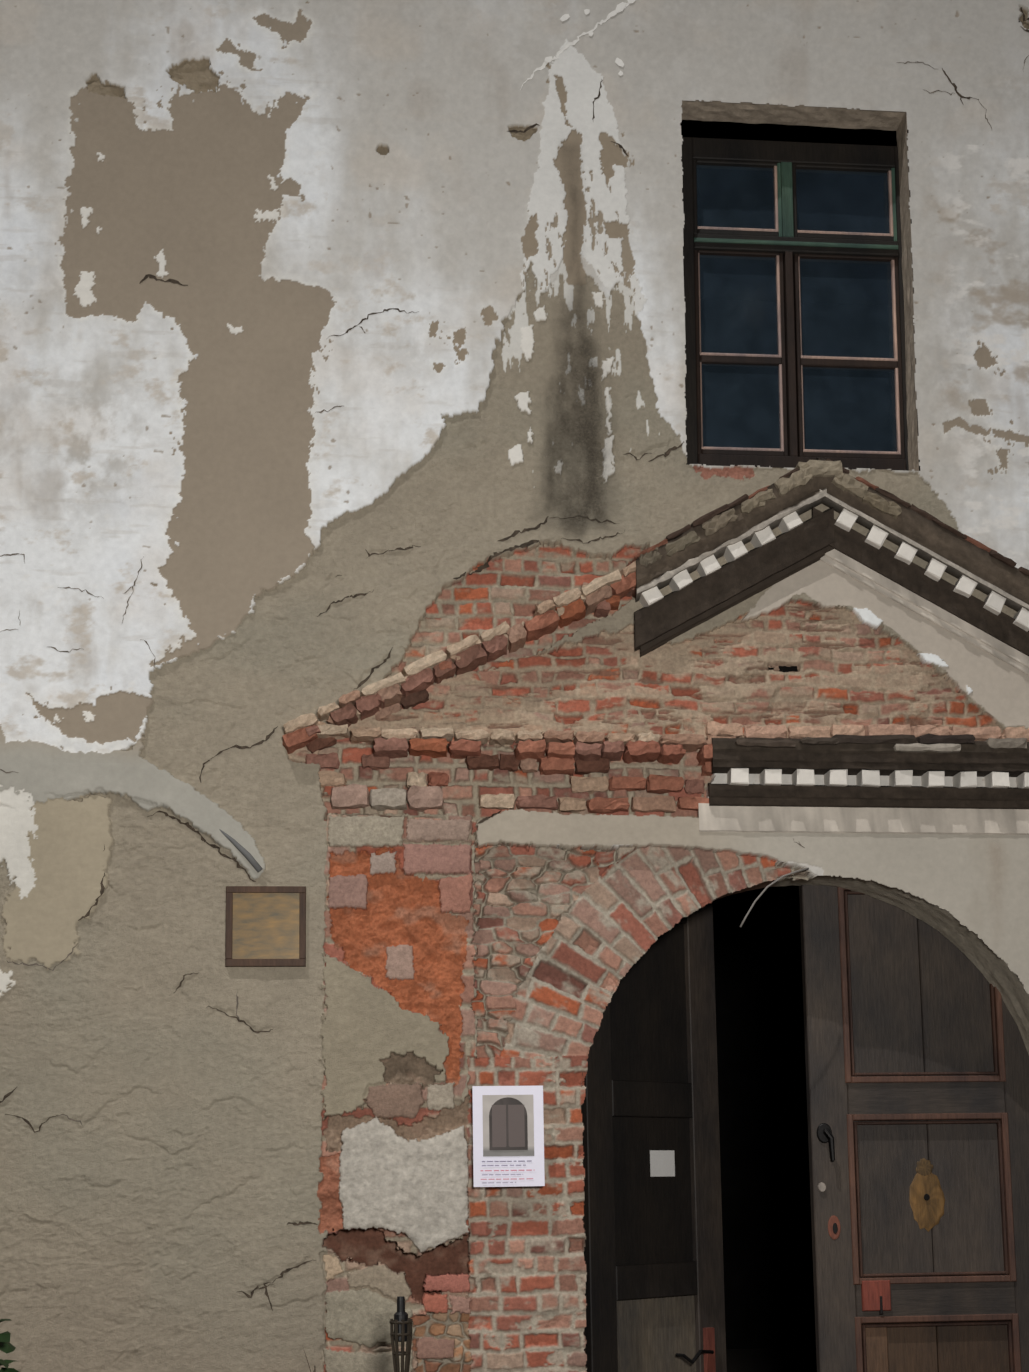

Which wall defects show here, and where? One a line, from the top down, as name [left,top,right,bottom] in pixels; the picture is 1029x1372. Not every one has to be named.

peeling [217,39,263,72]
crack [897,61,992,128]
water stain [502,39,648,526]
water stain [637,391,660,437]
peeling [932,399,1029,480]
flaking render [849,469,962,533]
flaking render [0,57,814,1372]
flaking render [313,585,1006,875]
crack [208,992,273,1033]
crack [0,1087,82,1133]
crack [287,1219,318,1227]
crack [239,1260,316,1311]